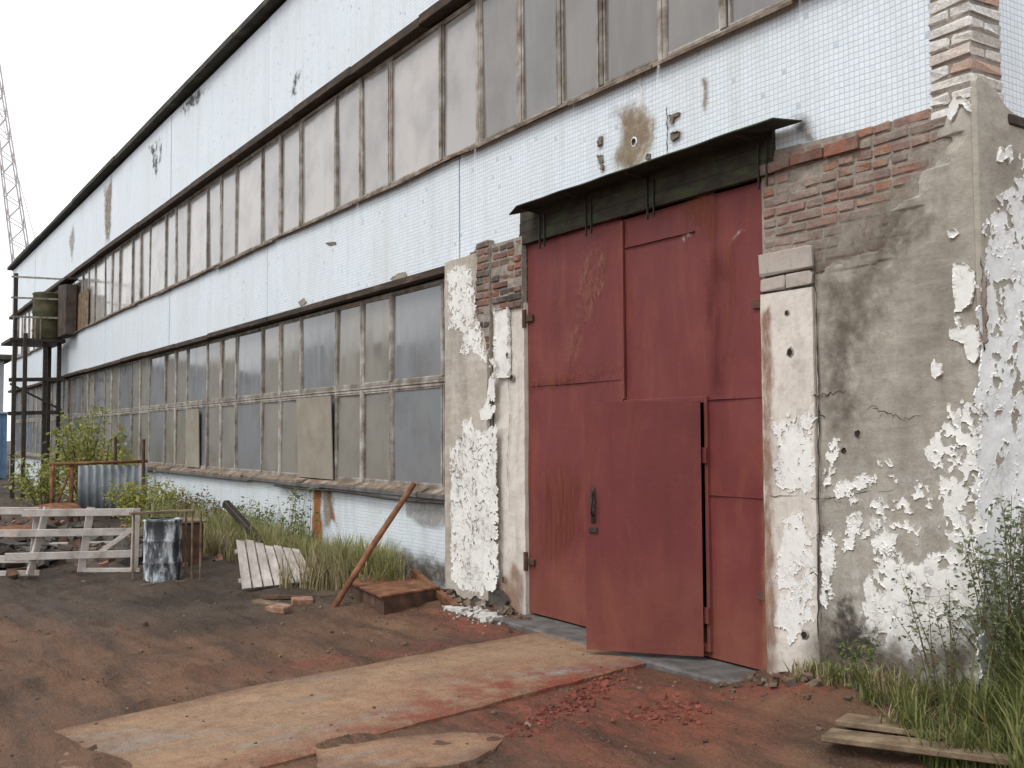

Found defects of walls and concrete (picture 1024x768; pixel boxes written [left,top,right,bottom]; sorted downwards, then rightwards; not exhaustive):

peeling [597,107,654,170]
spalling [759,96,972,274]
rust [312,489,334,545]
peeling [406,236,528,607]
crack [809,255,893,640]
peeling [769,145,1024,702]